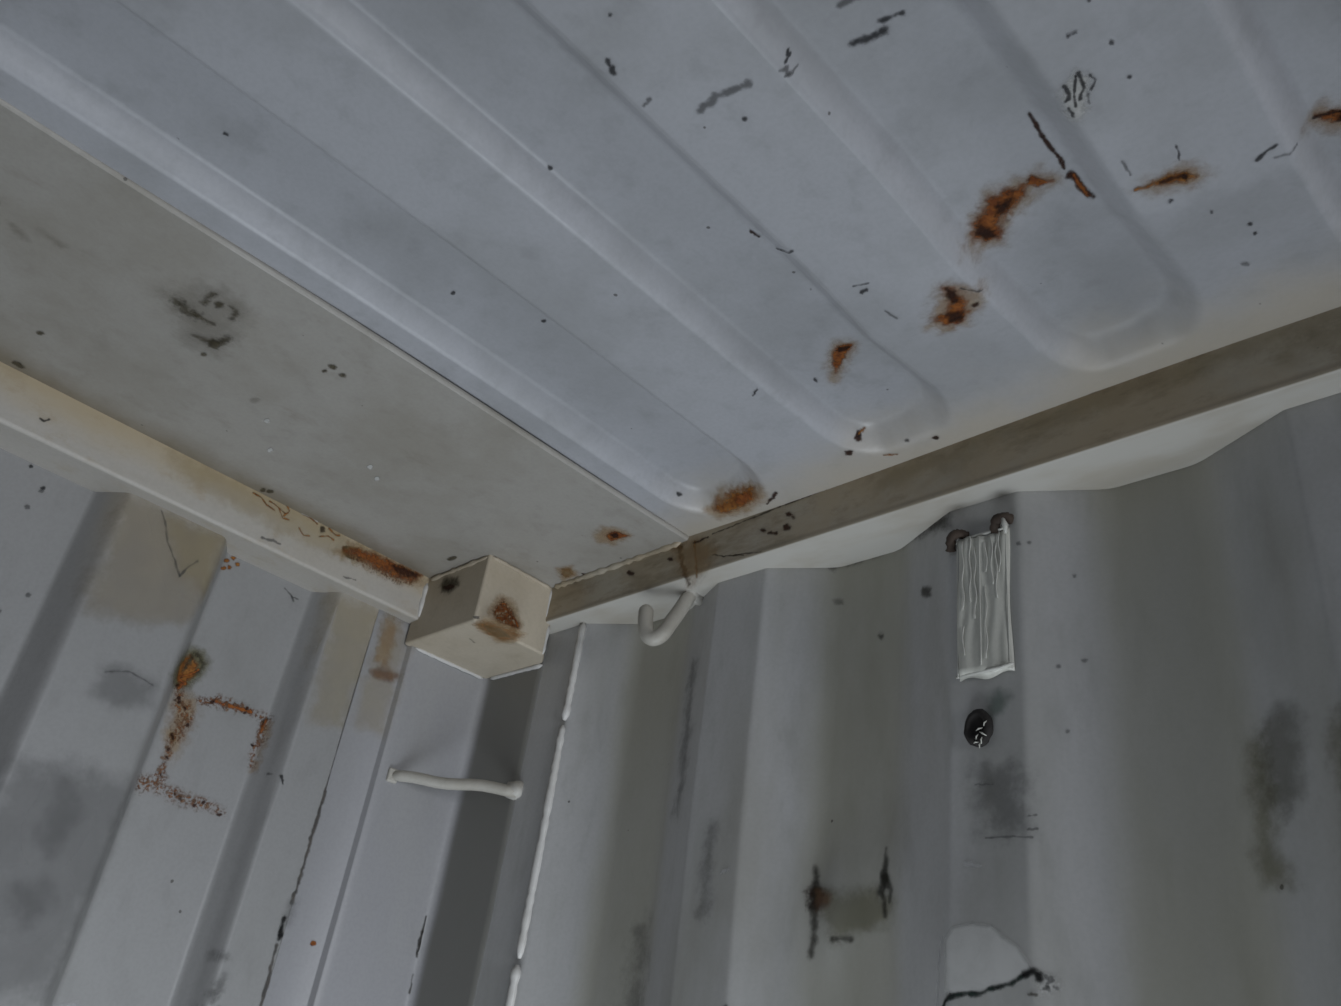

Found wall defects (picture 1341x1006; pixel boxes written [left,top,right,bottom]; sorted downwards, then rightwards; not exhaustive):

corrosion [1312,110,1341,122]
corrosion [972,113,1095,242]
corrosion [1134,172,1197,192]
corrosion [936,287,980,325]
corrosion [832,344,852,372]
corrosion [668,486,827,586]
corrosion [343,548,423,584]
corrosion [477,601,521,641]
corrosion [136,679,270,816]
crack [942,968,1043,1006]